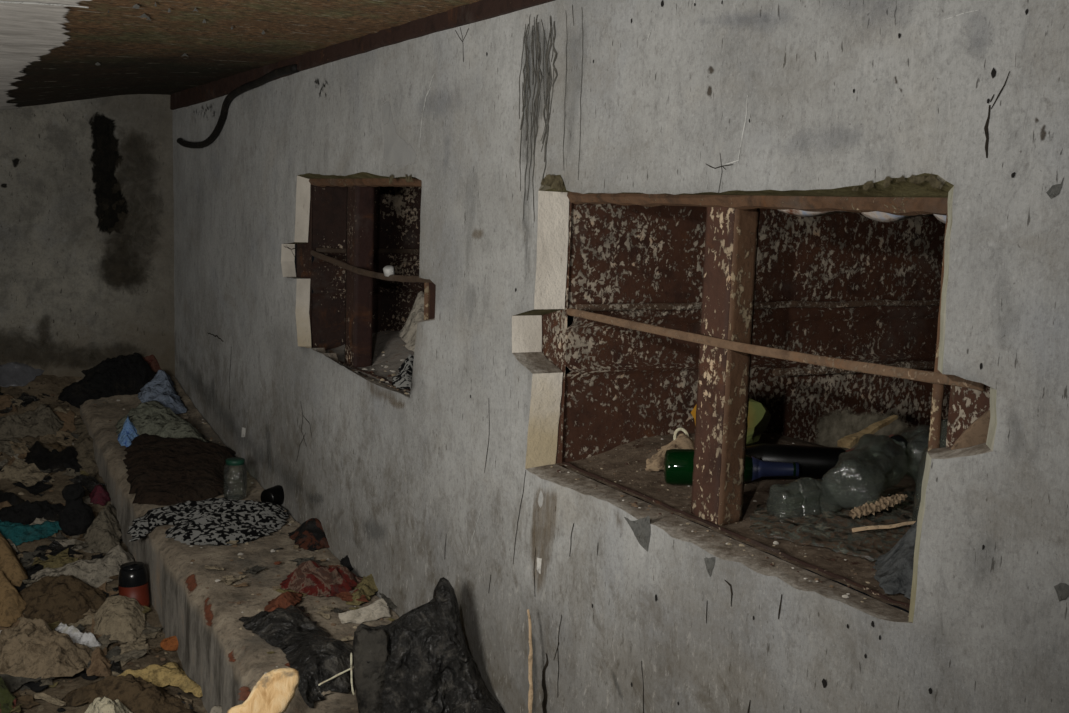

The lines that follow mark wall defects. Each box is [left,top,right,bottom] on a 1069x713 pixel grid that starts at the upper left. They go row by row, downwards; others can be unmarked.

peeling [89,113,128,234]